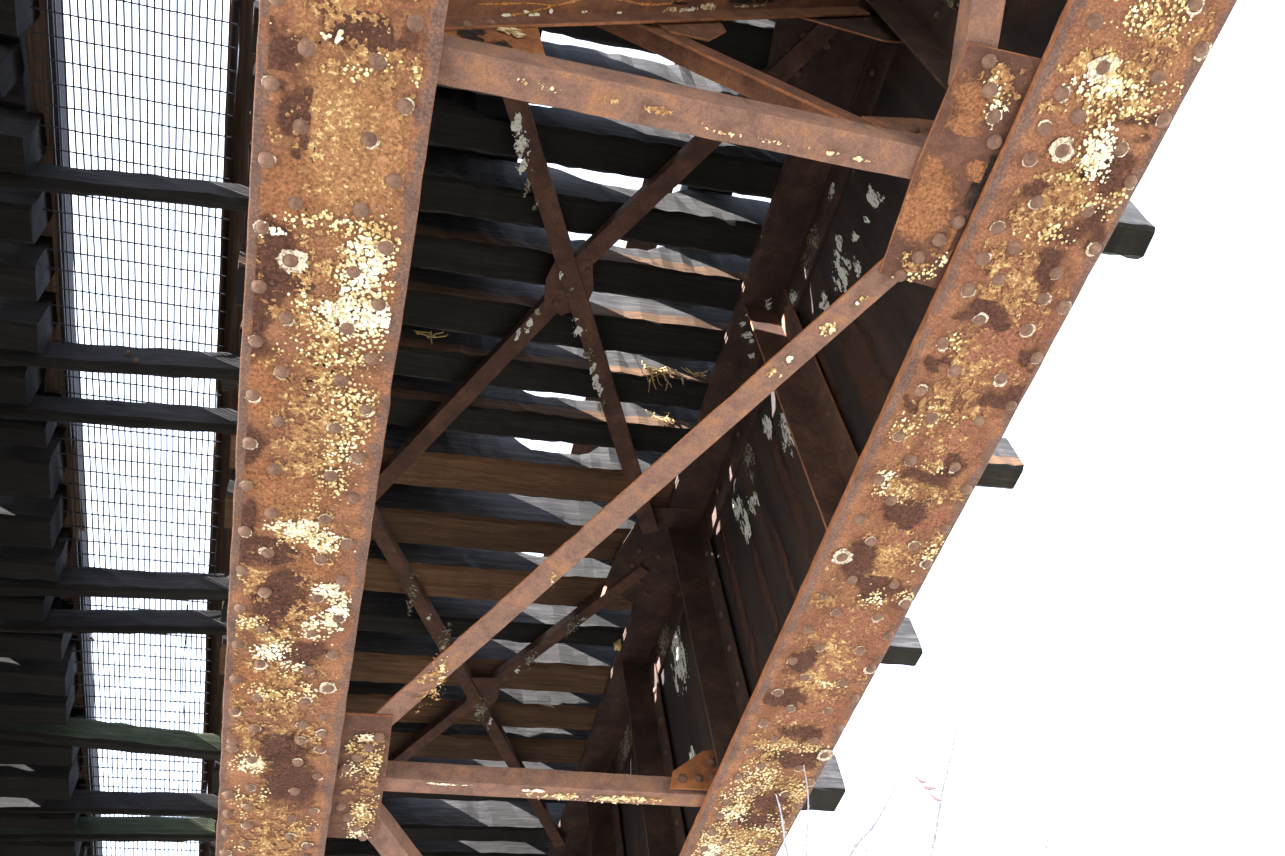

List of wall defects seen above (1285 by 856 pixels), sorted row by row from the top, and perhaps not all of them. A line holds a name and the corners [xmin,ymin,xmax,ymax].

peeling [662,3,716,12]
rust [259,43,412,244]
peeling [644,105,674,116]
rust [894,152,987,255]
rust [815,321,891,423]
rust [915,246,1078,467]
peeling [222,0,424,856]
peeling [691,0,1215,856]
rust [243,452,340,520]
peeling [411,622,453,713]
rust [750,527,900,731]
peeling [522,789,683,805]